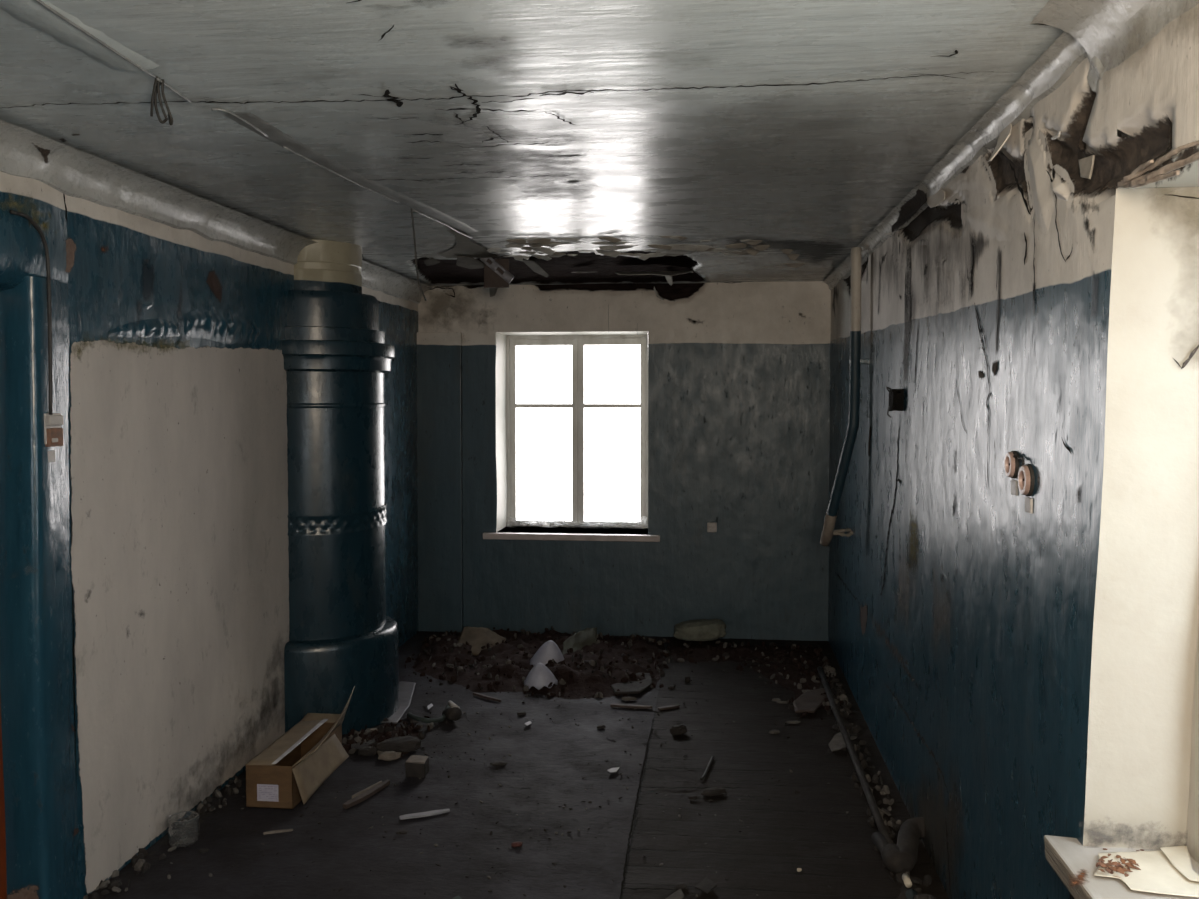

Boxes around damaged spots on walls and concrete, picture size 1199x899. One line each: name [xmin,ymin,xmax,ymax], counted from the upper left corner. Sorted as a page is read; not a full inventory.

crack [2,50,994,181]
spalling [986,87,1199,212]
spalling [413,230,846,301]
spalling [884,189,963,241]
water stain [969,236,984,292]
crack [954,164,1073,487]
crack [880,420,901,595]
spalling [6,885,39,899]